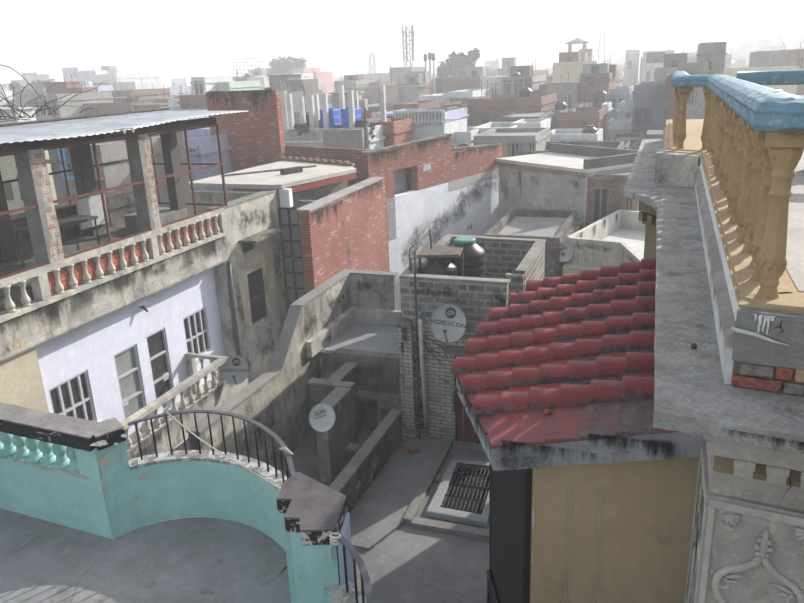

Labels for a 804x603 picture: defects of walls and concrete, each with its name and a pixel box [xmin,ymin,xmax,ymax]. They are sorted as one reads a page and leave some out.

water stain [754,314,776,334]
spalling [731,361,804,396]
peeling [90,434,127,492]
water stain [500,440,564,469]
water stain [589,433,674,459]